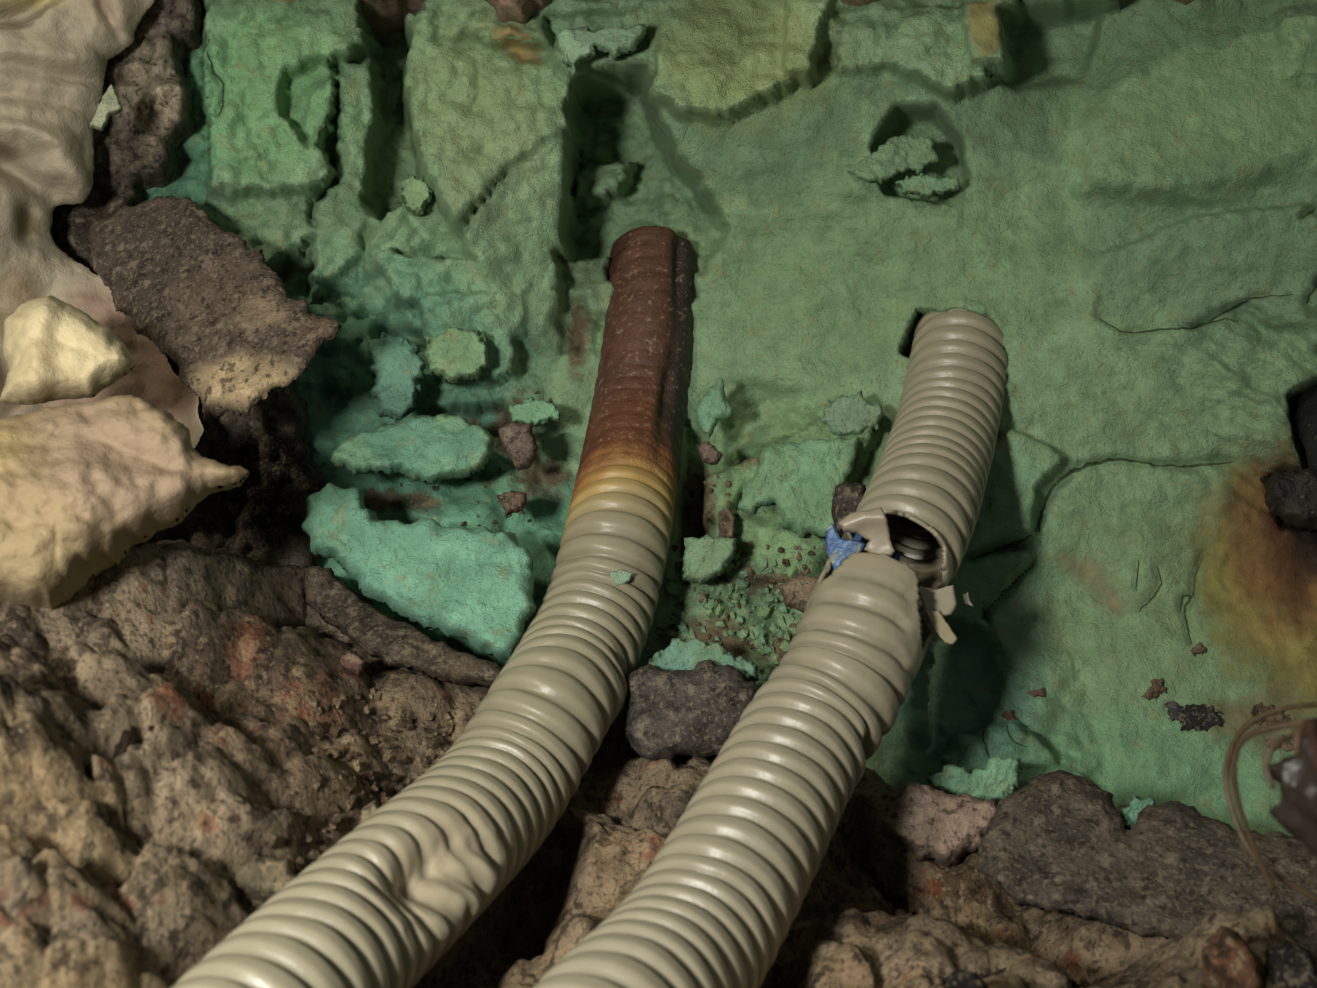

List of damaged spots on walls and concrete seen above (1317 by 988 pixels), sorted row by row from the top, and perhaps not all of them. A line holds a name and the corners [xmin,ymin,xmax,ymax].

flaking render [85,195,341,422]
peeling [400,174,434,216]
peeling [847,133,959,198]
rust [1202,432,1317,702]